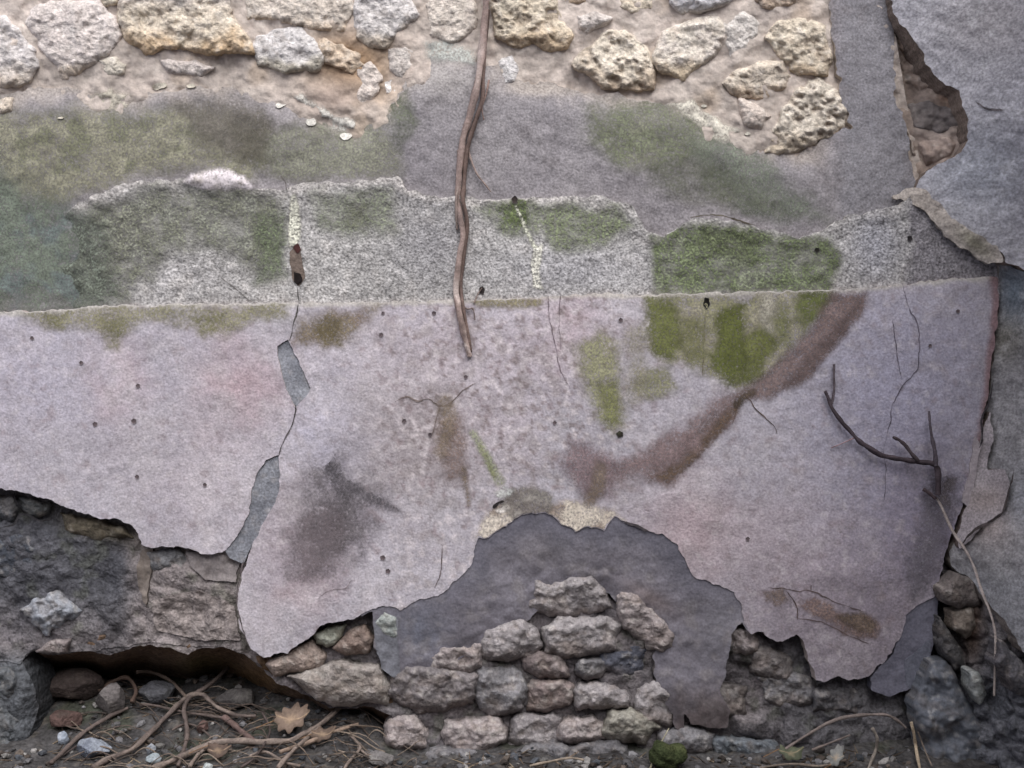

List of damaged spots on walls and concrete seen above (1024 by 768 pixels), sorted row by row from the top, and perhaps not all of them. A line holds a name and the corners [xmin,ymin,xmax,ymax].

efflorescence [186,169,252,190]
efflorescence [288,195,301,246]
damp [276,94,355,141]
spalling [896,38,960,175]
crack [225,244,310,647]
damp [297,462,399,577]
damp [629,291,830,384]
crack [883,288,920,500]
spalling [952,412,1010,549]
spalling [0,488,393,721]
peeling [361,486,748,730]
crack [768,585,869,644]